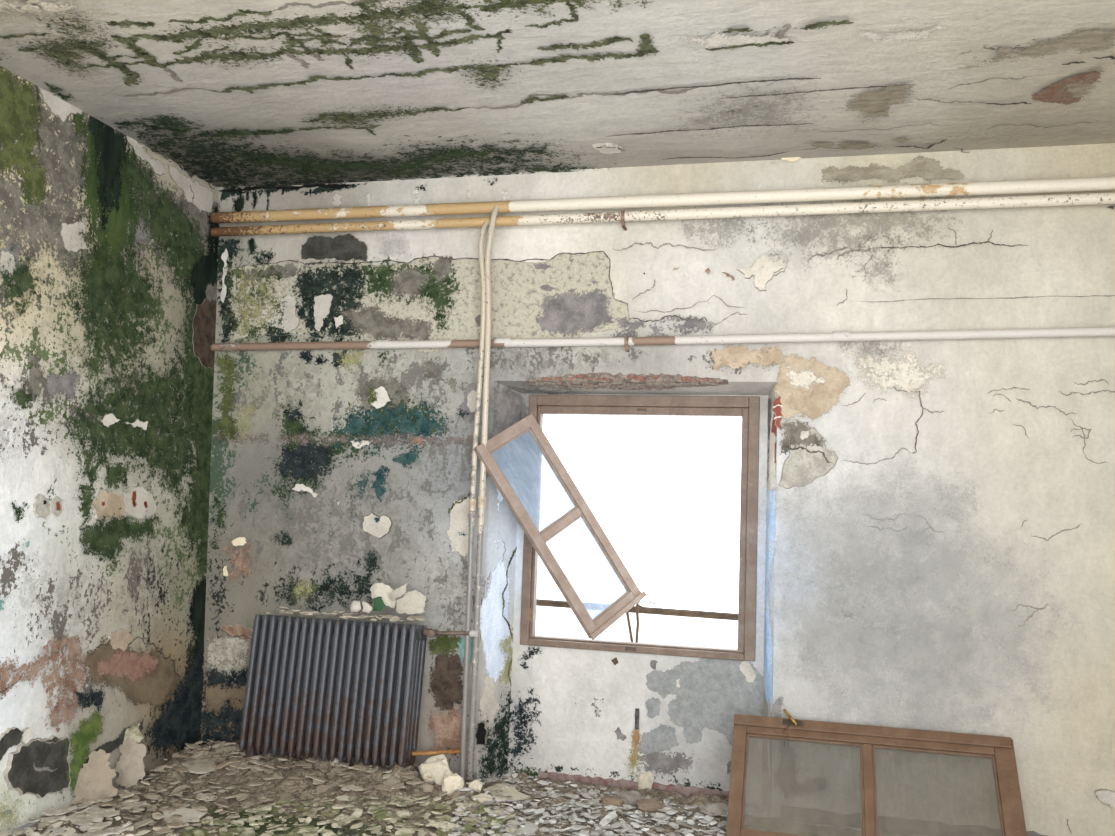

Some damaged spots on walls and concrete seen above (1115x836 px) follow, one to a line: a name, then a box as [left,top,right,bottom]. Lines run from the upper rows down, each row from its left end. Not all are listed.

crack [0,0,1100,201]
damp [0,246,52,321]
peeling [190,233,724,424]
crack [837,226,1115,305]
damp [4,383,43,409]
damp [57,115,616,783]
peeling [527,344,850,491]
crack [840,349,944,465]
crack [987,379,1115,464]
damp [10,500,29,523]
peeling [0,628,183,799]
peeling [614,658,783,777]